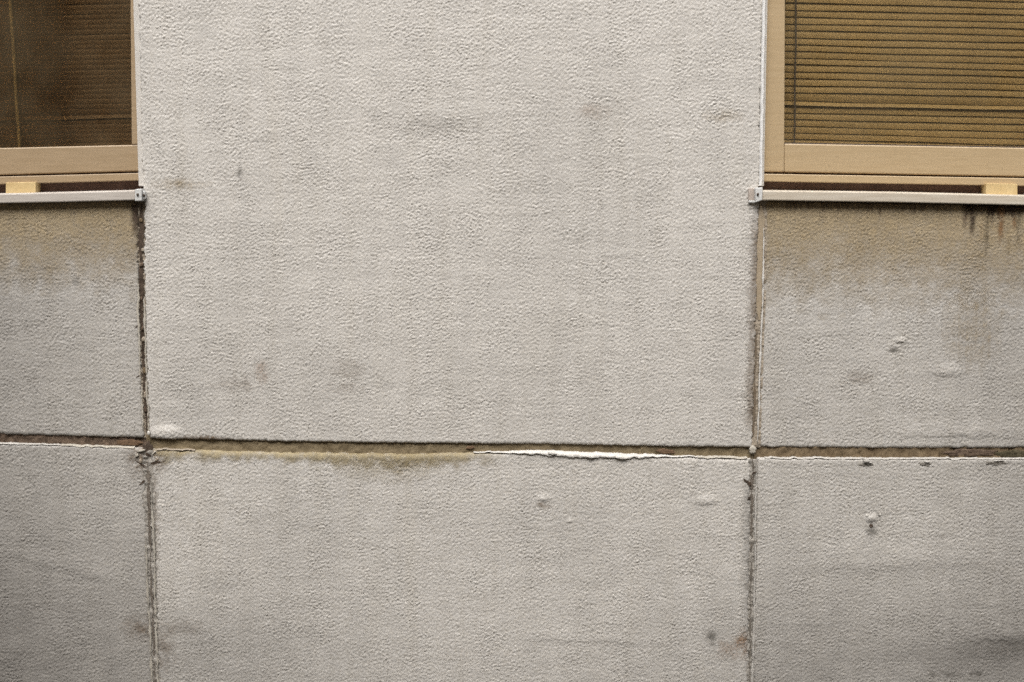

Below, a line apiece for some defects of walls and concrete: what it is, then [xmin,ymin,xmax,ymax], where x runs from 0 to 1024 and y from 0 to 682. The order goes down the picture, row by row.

damp [765,201,1024,272]
damp [157,449,478,465]